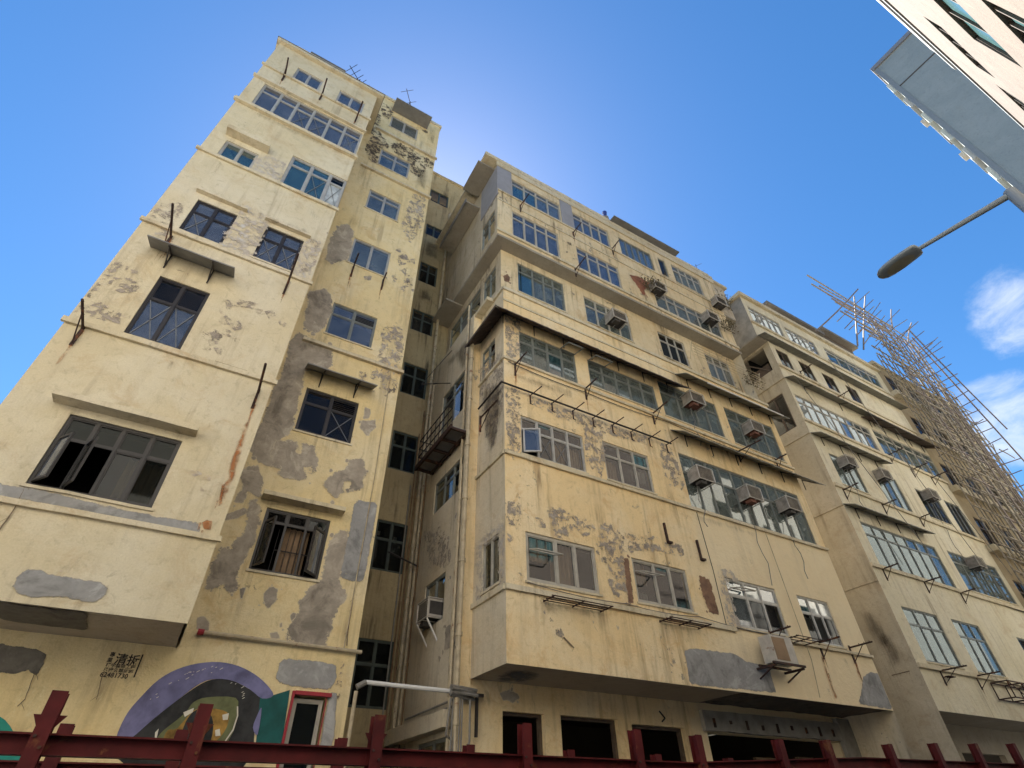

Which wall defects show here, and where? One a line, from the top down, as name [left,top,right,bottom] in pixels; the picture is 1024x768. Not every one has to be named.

spalling [365,106,434,177]
peeling [392,194,426,292]
peeling [74,261,141,324]
rust [219,405,256,503]
peeling [201,223,369,599]
peeling [480,315,684,490]
peeling [258,584,282,609]
peeling [535,507,684,604]